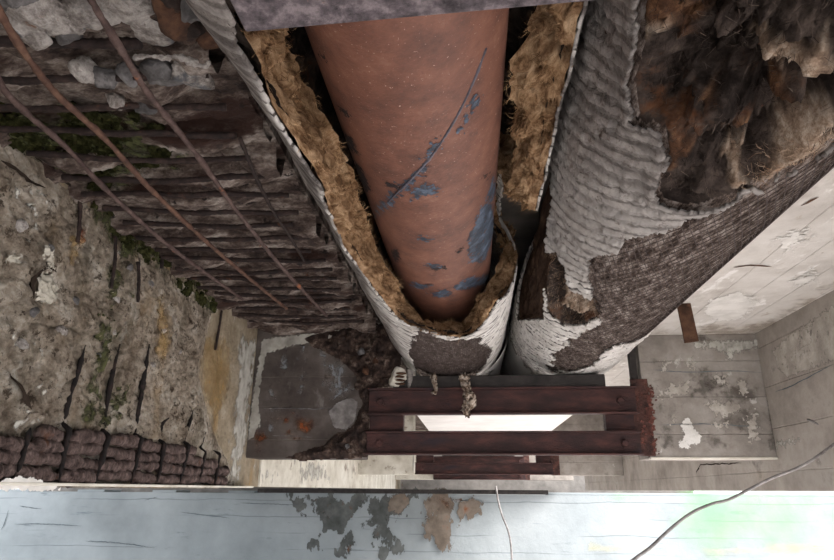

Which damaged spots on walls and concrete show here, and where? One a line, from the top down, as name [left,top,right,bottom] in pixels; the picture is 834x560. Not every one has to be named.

spalling [0,0,484,560]
peeling [637,380,695,457]
peeling [669,414,702,449]
peeling [703,372,763,445]